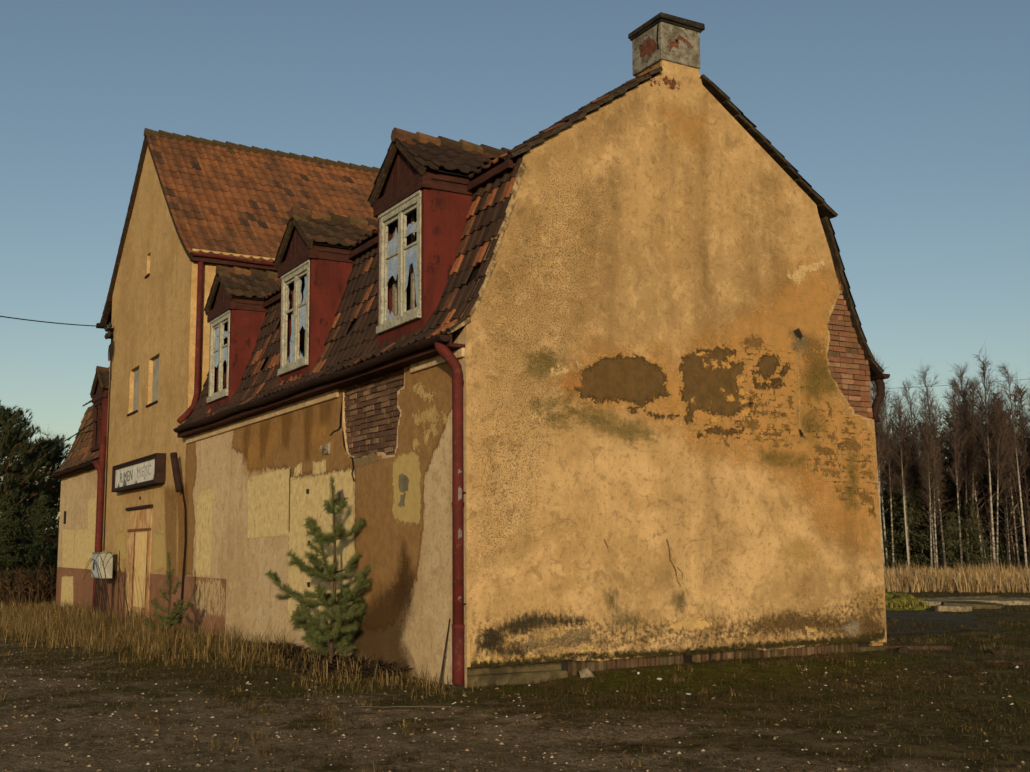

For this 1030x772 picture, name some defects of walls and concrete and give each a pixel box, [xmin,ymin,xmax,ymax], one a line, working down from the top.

flaking render [638,34,694,57]
peeling [185,441,226,618]
peeling [231,358,459,618]
peeling [566,269,877,549]
leakage [477,613,590,657]